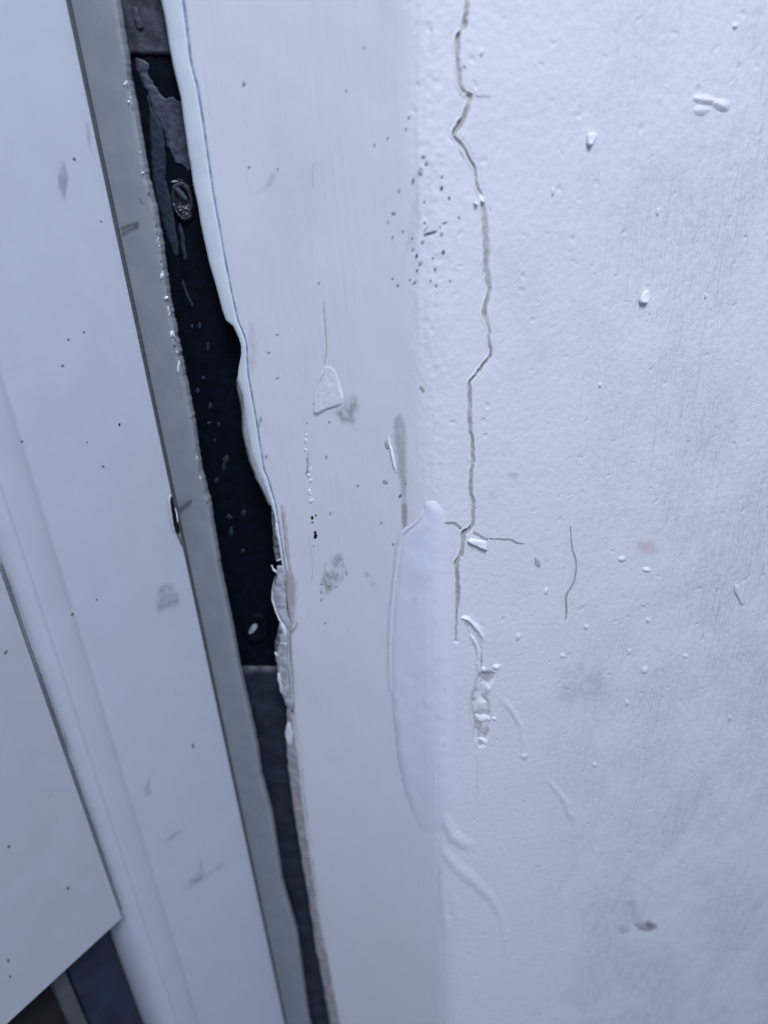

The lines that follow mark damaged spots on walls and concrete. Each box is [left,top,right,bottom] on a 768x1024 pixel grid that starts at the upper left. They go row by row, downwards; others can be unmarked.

crack [444,0,524,640]
crack [565,526,577,619]
spalling [460,615,501,748]